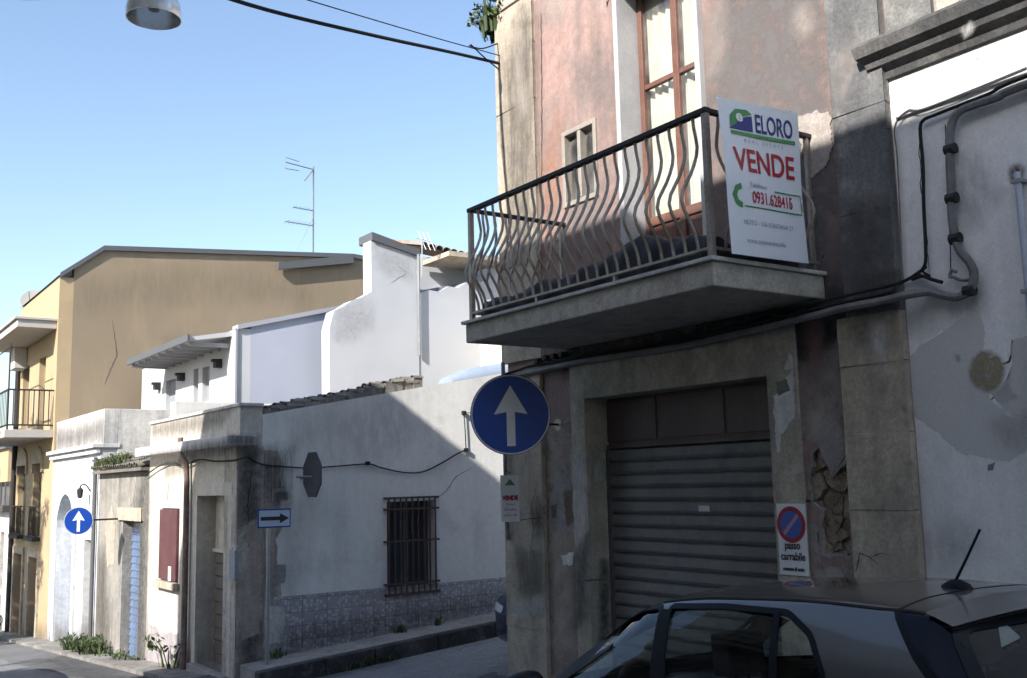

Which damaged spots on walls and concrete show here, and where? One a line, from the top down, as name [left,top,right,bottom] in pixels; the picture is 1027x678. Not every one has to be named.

flaking render [773,331,854,578]
leakage [970,352,1003,390]